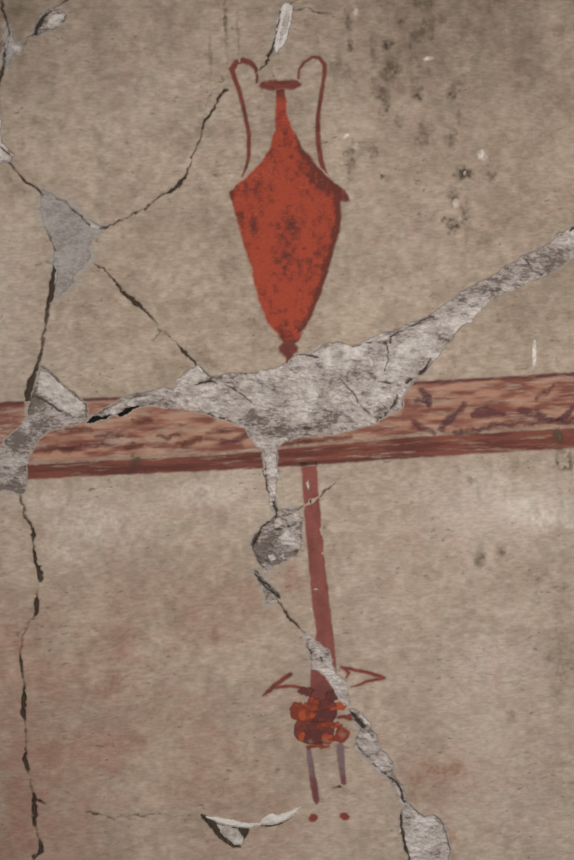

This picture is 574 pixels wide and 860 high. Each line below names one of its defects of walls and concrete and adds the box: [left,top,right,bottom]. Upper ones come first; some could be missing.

spalling [0,113,14,164]
crack [101,89,228,229]
spalling [476,148,490,162]
crack [25,238,58,401]
spalling [40,191,103,296]
crack [95,264,152,318]
spalling [0,226,574,604]
crack [20,497,43,616]
crack [19,655,27,721]
spalling [303,634,450,860]
crack [32,793,43,860]
peeling [201,806,301,848]